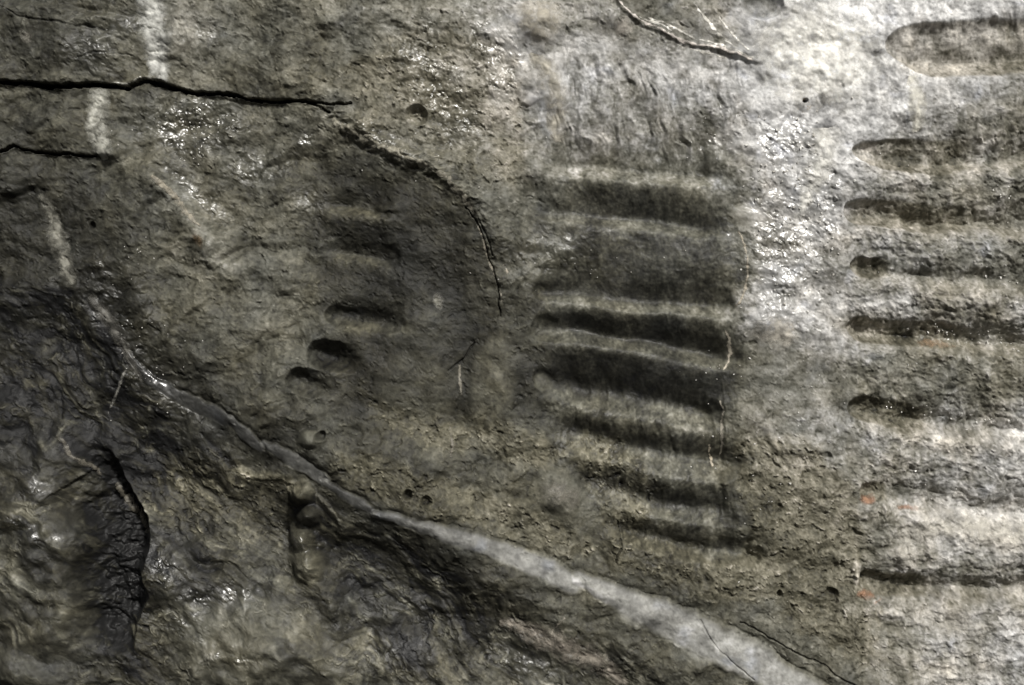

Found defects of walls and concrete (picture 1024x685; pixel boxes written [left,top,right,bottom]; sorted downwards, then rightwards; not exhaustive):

crack [0,5,347,114]
crack [0,145,97,158]
crack [466,208,508,317]